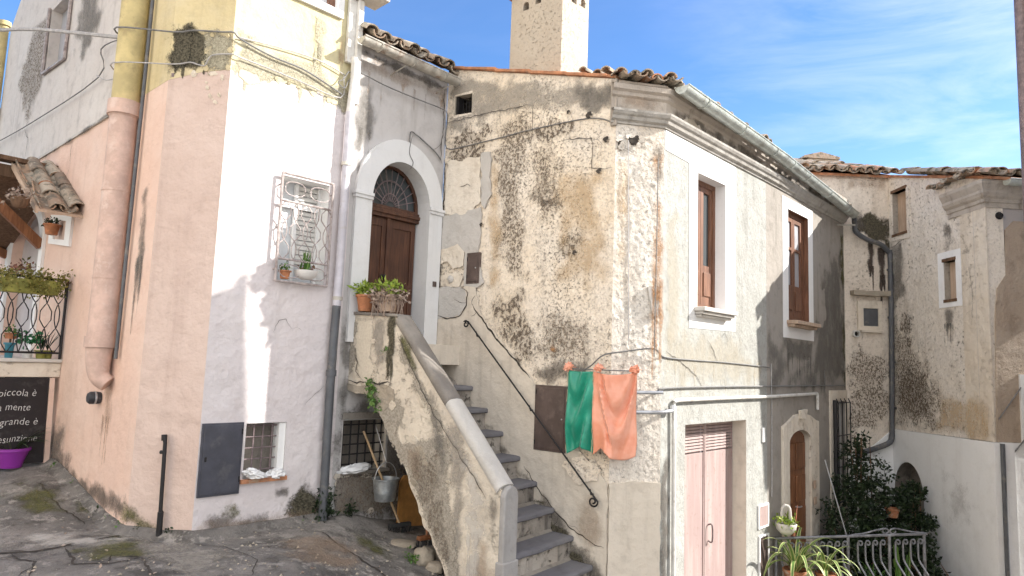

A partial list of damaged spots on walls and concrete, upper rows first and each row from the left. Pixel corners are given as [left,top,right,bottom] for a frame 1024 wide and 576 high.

water stain [18,16,51,120]
water stain [77,0,99,58]
water stain [166,22,231,78]
water stain [130,218,145,333]
water stain [373,316,396,382]
spalling [450,110,589,363]
corrosion [652,205,663,373]
water stain [769,237,846,390]
water stain [857,212,905,303]
spalling [333,319,459,576]